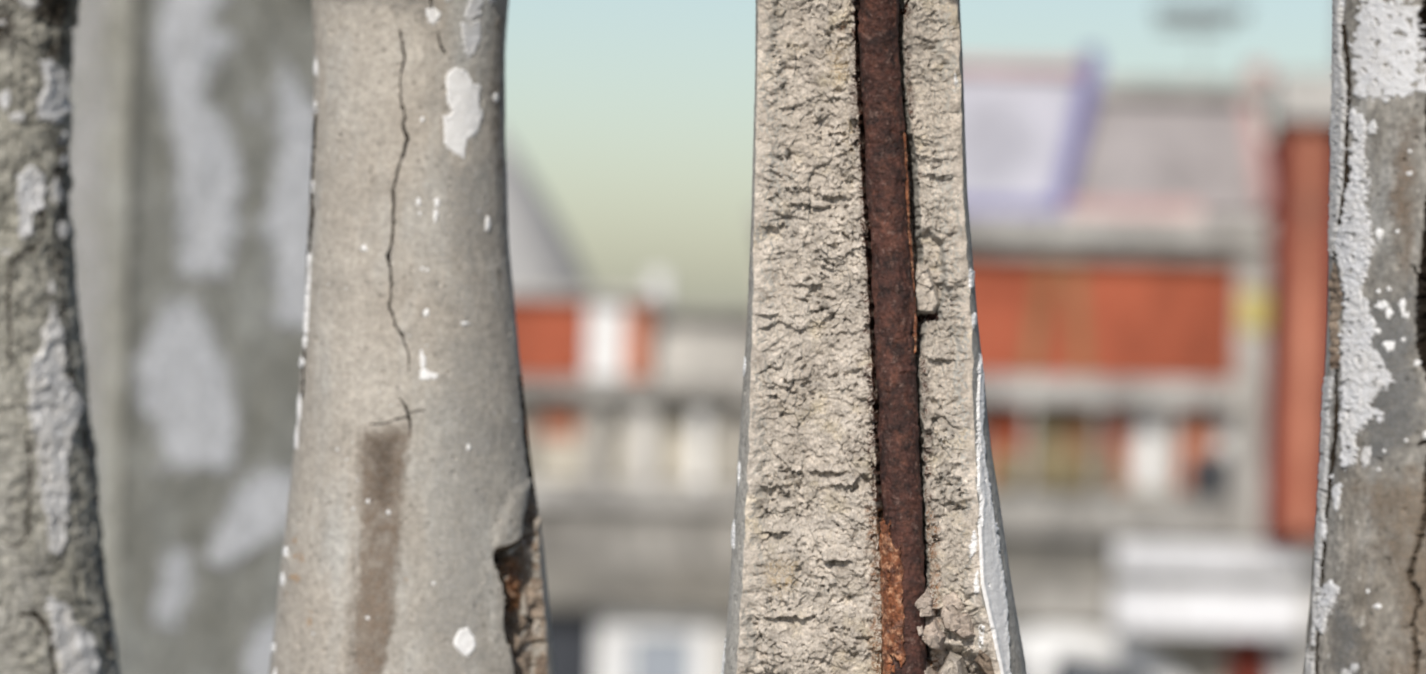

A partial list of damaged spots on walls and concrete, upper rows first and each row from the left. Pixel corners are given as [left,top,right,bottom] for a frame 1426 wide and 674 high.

peeling [0,0,106,555]
leakage [354,433,407,674]
crack [369,29,426,438]
spalling [721,0,883,674]
rust [838,0,883,674]
rust [899,3,923,262]
rust [917,309,940,622]
spalling [898,0,1012,674]
peeling [1305,0,1426,674]
crack [1406,440,1426,674]
crack [1410,196,1426,381]
crack [1417,0,1426,63]